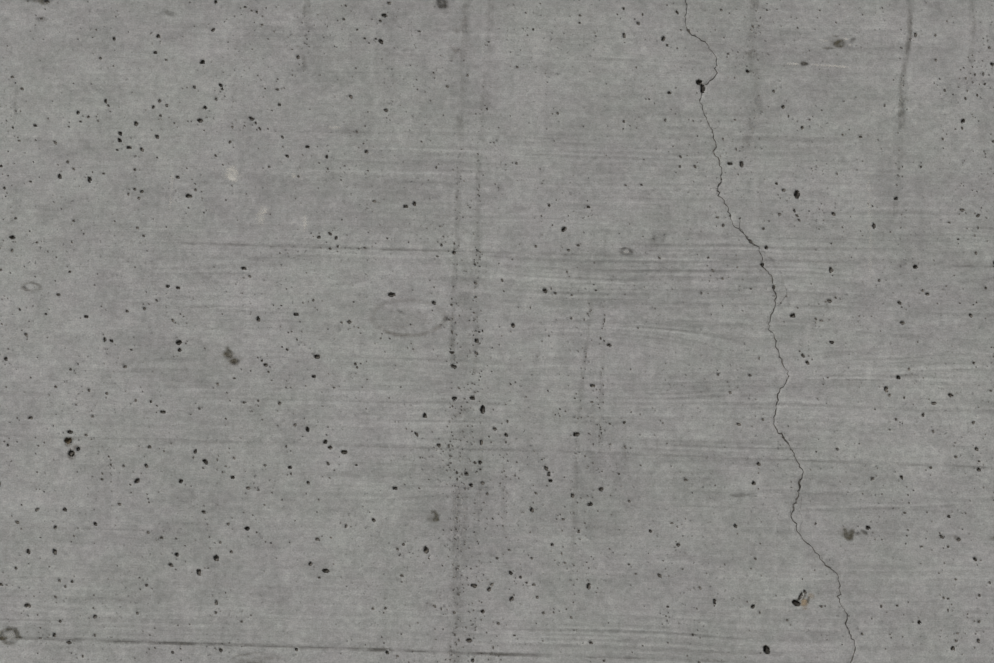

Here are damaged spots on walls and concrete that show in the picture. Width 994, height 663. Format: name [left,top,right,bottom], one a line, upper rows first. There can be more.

crack [685,1,856,663]